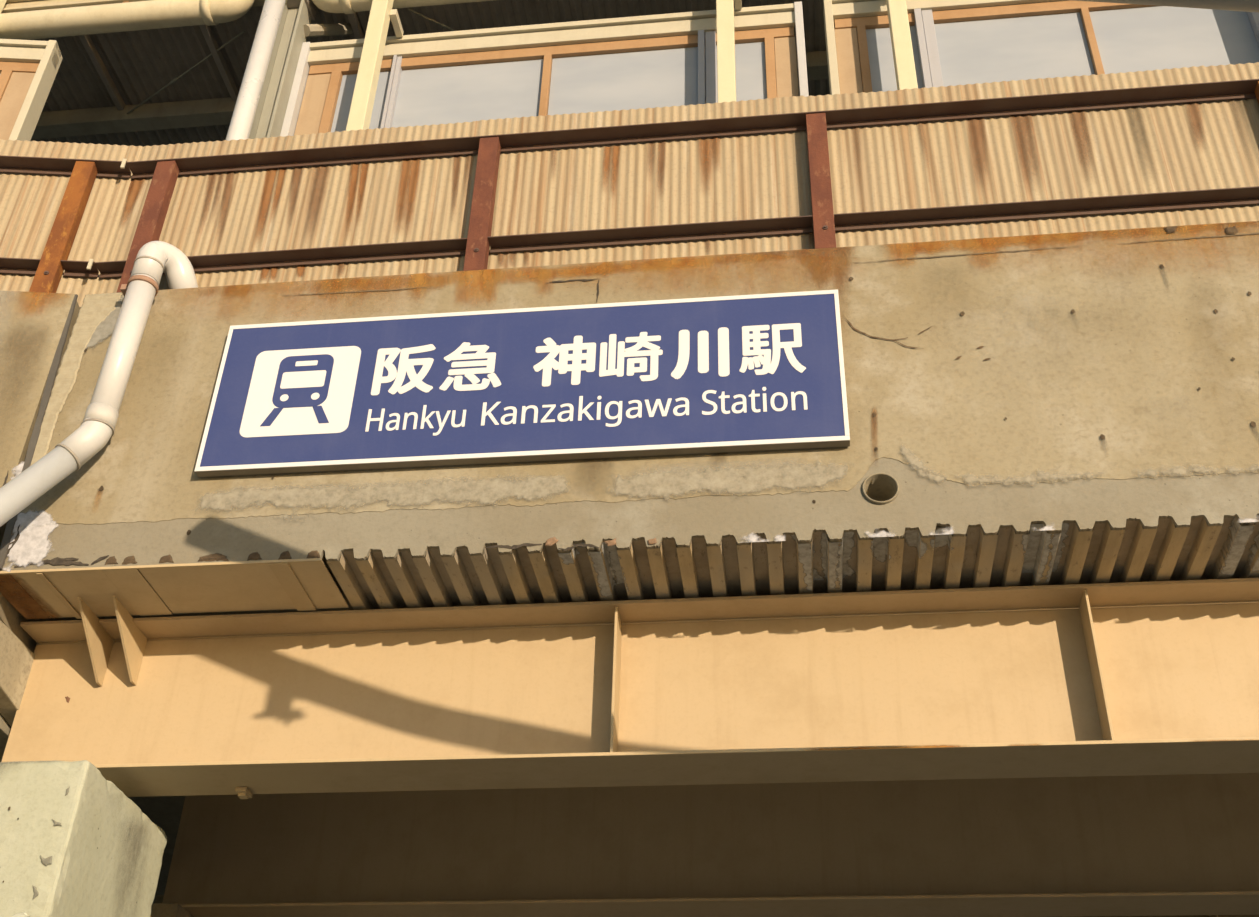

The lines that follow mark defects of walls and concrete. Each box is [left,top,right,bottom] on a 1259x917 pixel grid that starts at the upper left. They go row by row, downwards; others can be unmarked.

corrosion [968,117,985,170]
corrosion [1012,114,1034,172]
corrosion [1070,110,1088,159]
corrosion [123,178,144,218]
corrosion [204,171,235,224]
corrosion [259,165,328,231]
corrosion [348,162,369,221]
corrosion [397,158,420,222]
corrosion [458,232,849,299]
corrosion [890,221,1259,260]
peeling [820,532,859,589]
peeling [904,528,953,559]